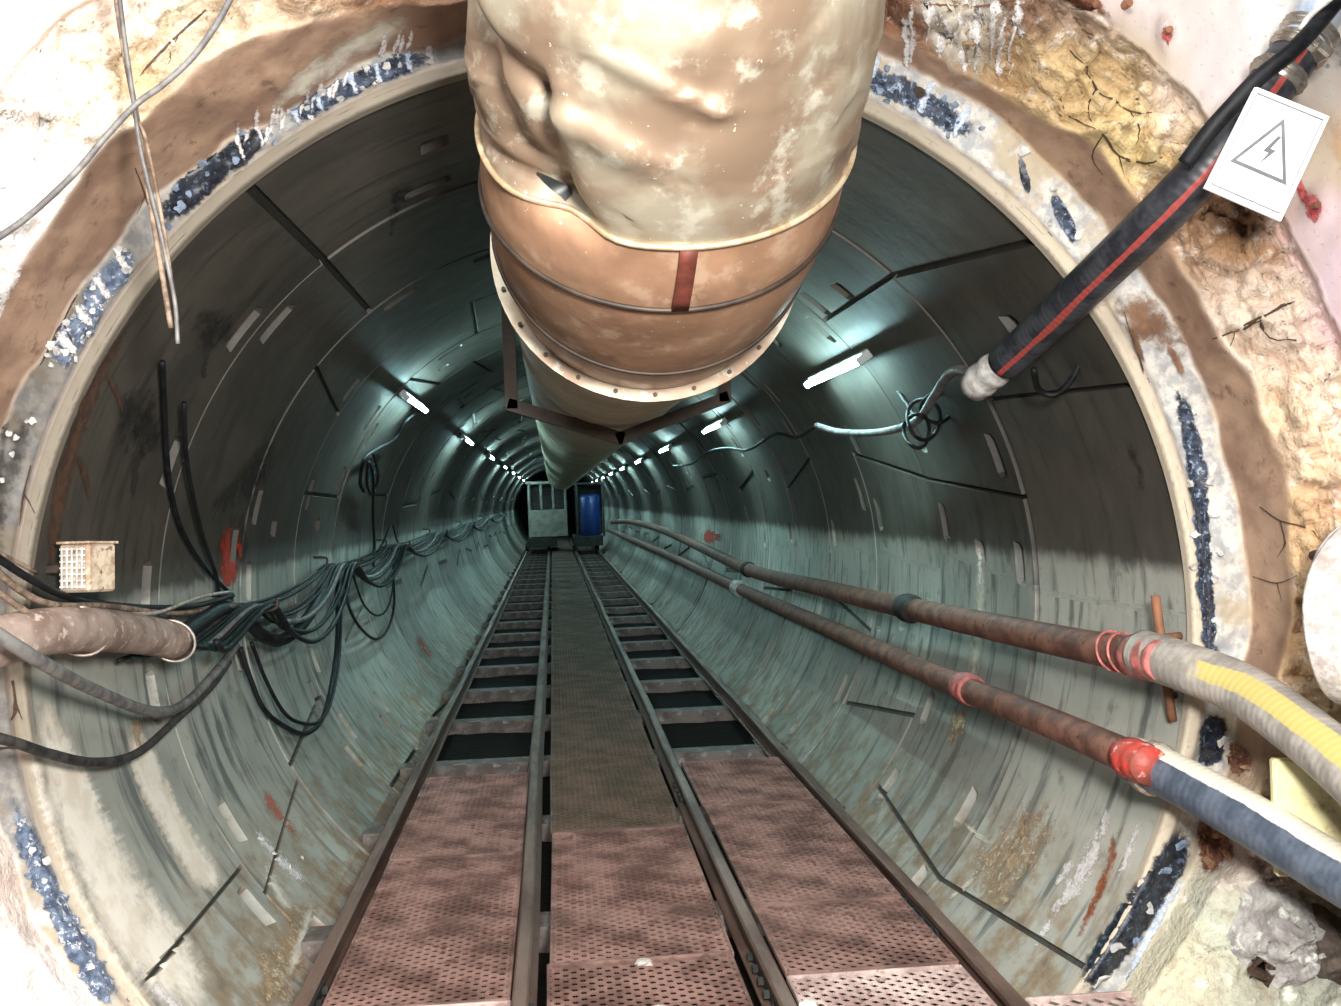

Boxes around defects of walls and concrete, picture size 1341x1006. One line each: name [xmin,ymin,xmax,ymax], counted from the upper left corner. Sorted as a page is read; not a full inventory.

spalling [1069,0,1107,14]
peeling [870,55,986,139]
peeling [162,110,277,231]
peeling [1018,146,1031,193]
peeling [1046,185,1081,243]
rust [1297,179,1322,222]
peeling [44,245,134,368]
peeling [1176,391,1224,651]
peeling [13,807,117,1004]
water stain [1035,810,1109,946]
rust [1079,837,1117,933]
water stain [1118,825,1139,877]